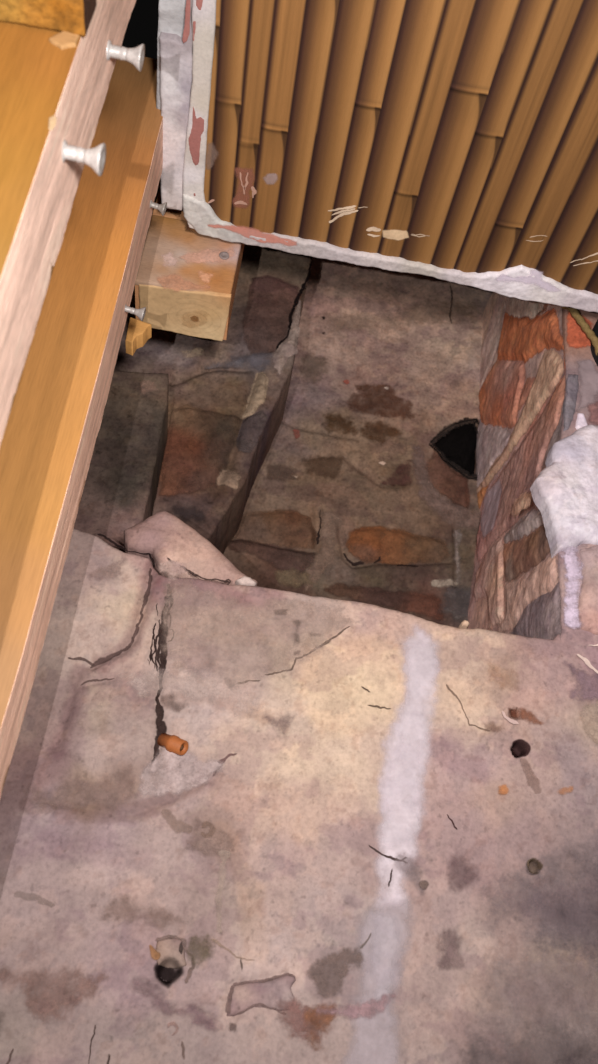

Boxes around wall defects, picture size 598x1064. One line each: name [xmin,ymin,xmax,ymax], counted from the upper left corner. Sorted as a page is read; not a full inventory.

peeling [182,0,203,43]
peeling [188,107,204,166]
flaking render [242,275,301,375]
flaking render [228,510,318,576]
crack [68,533,231,763]
crack [238,626,350,684]
peeling [140,748,222,795]
damp [386,647,434,843]
spalling [154,964,183,987]
flaking render [310,949,363,996]
damp [318,902,408,1064]
rust [283,1000,336,1045]